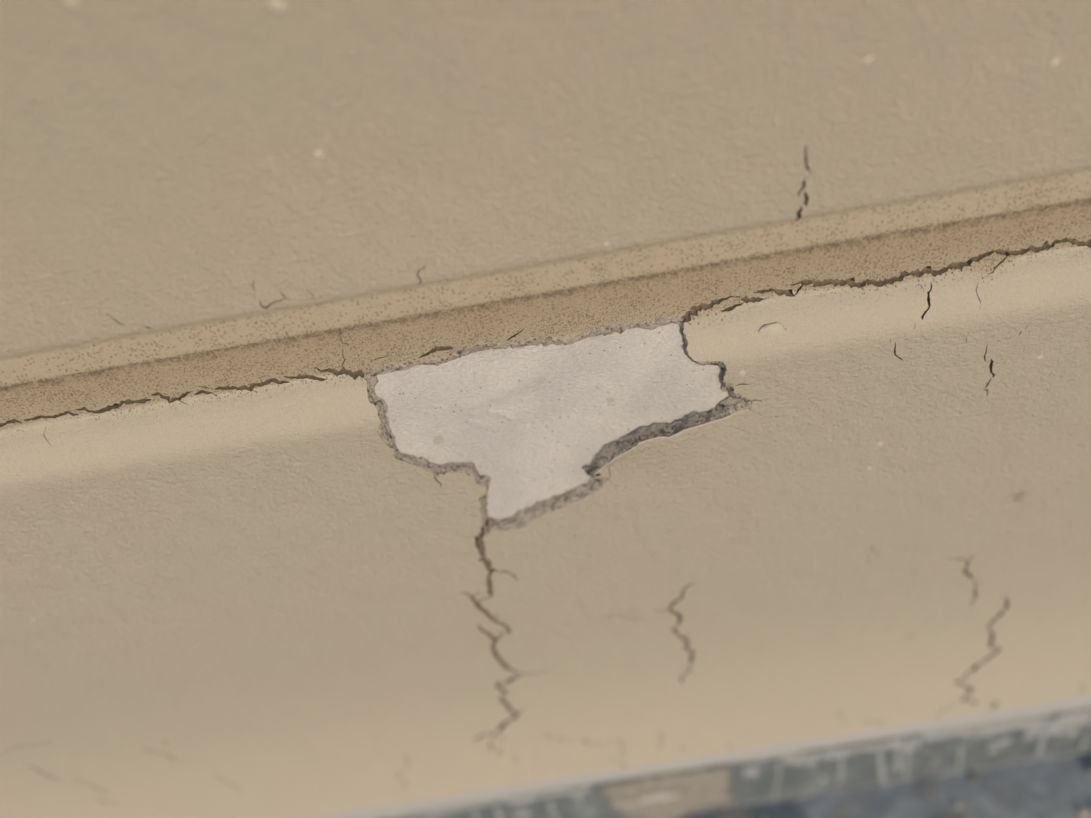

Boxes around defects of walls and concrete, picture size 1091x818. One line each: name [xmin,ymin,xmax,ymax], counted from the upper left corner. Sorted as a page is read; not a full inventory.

crack [795,146,812,221]
crack [0,333,388,446]
crack [253,281,314,309]
crack [420,333,454,358]
peeling [362,316,774,537]
crack [679,237,1091,360]
crack [966,332,995,397]
crack [462,519,550,761]
crack [655,583,696,683]
crack [950,555,1009,709]